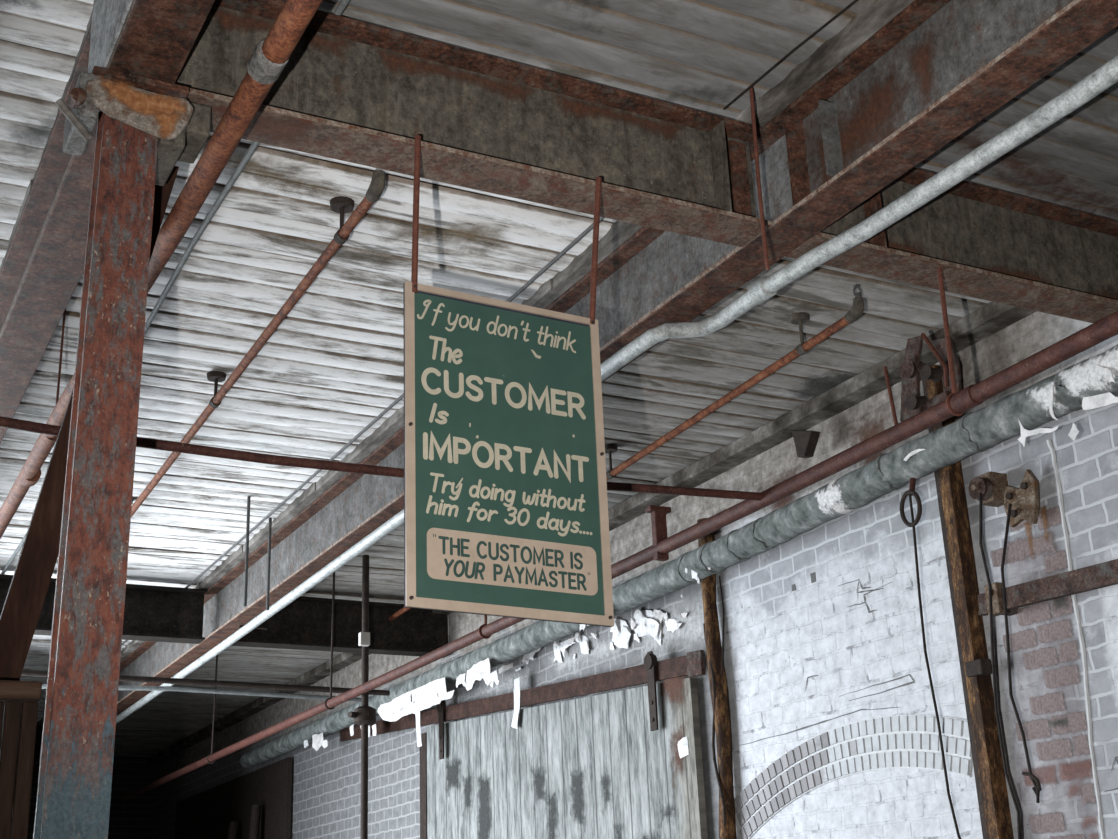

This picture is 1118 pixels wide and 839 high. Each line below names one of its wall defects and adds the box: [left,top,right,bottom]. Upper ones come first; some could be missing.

corrosion [101,78,186,136]
corrosion [838,77,904,162]
peeling [991,506,1068,573]
corrosion [1024,507,1048,558]
crack [839,579,892,613]
peeling [429,602,704,710]
peeling [1003,596,1096,804]
peeling [678,737,689,758]
peeling [1029,812,1098,839]